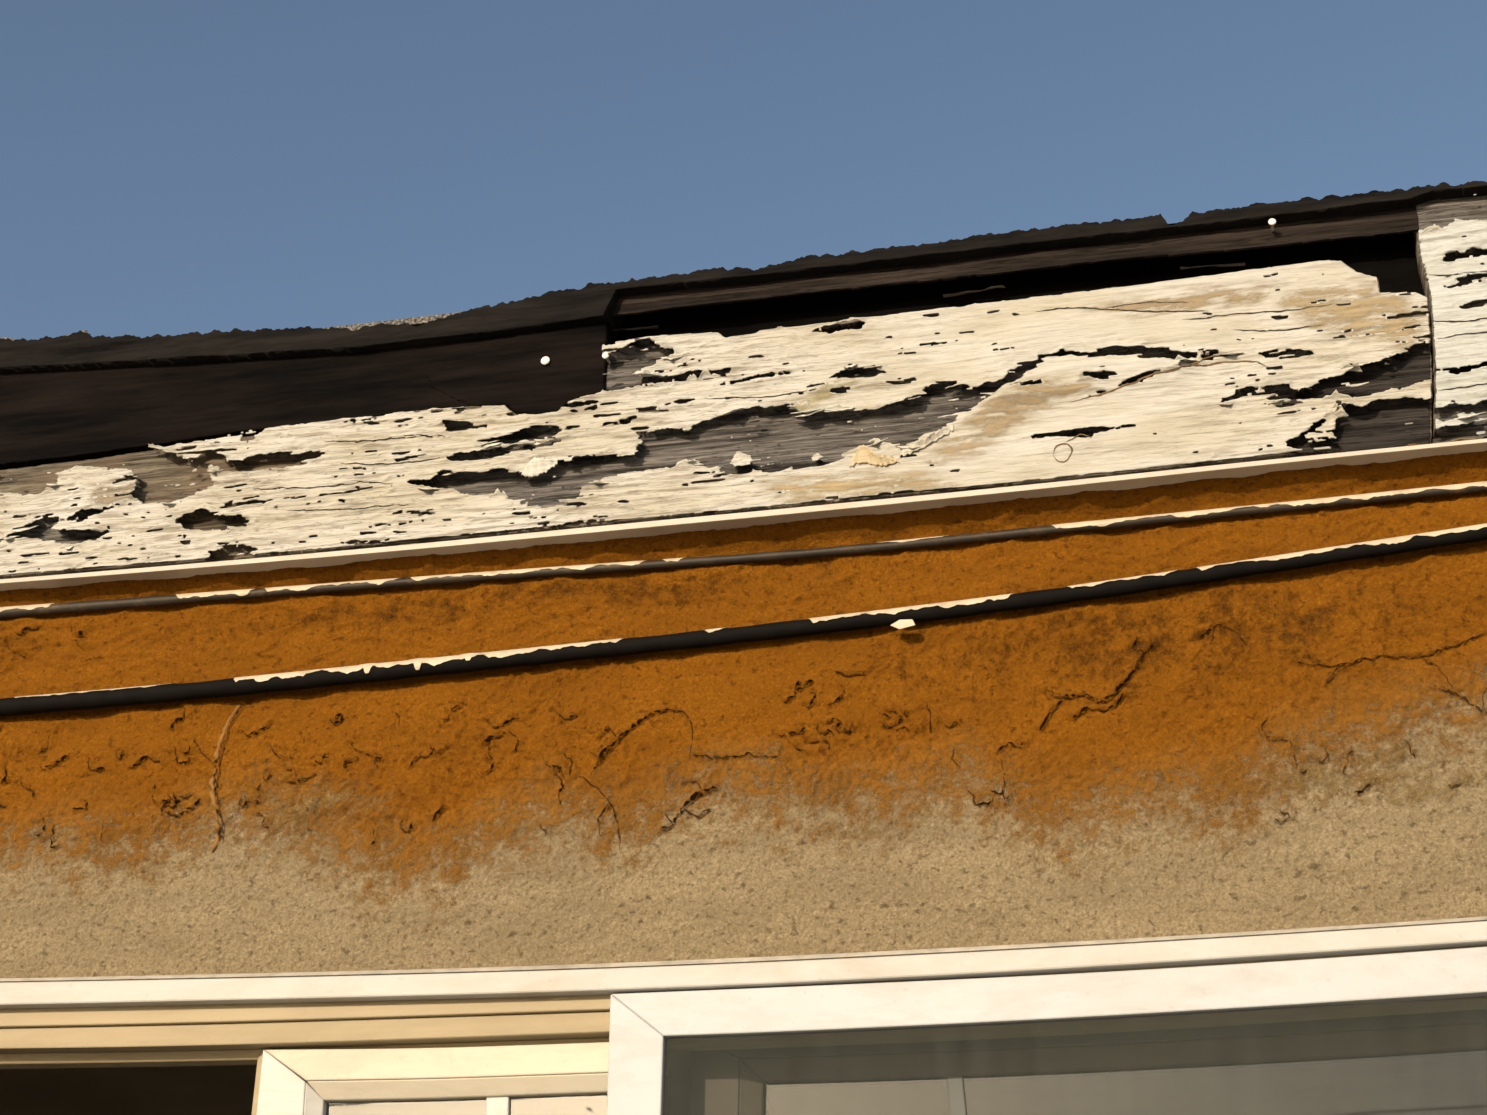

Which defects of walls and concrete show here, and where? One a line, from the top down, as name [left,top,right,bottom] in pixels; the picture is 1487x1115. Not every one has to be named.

peeling [1416,195,1487,236]
peeling [1443,248,1487,309]
peeling [815,321,865,334]
peeling [407,339,1048,510]
peeling [1218,342,1487,454]
peeling [0,436,325,562]
crack [1196,624,1245,644]
water stain [1195,588,1354,659]
crack [1297,633,1487,713]
crack [0,709,214,848]
crack [237,637,1153,852]
crack [1261,719,1371,794]